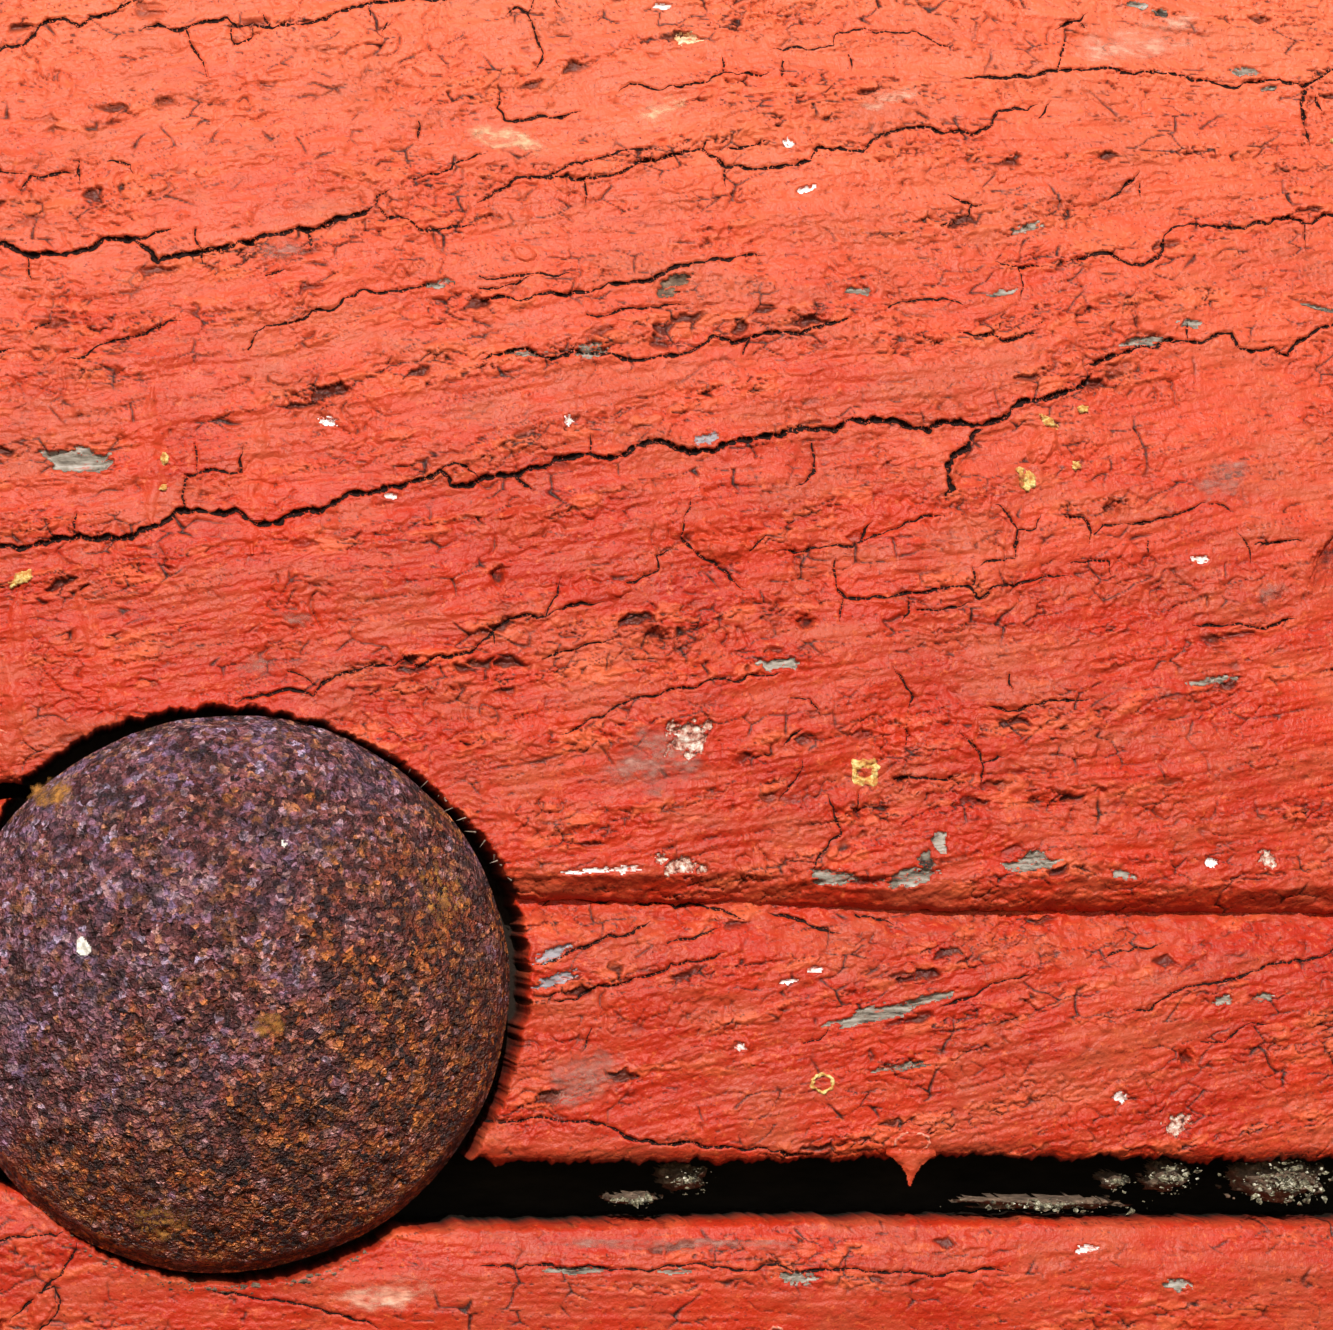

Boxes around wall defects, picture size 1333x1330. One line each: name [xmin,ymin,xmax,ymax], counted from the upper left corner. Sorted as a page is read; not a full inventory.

crack [0,0,445,79]
crack [0,12,1333,280]
crack [247,253,763,351]
crack [481,316,852,362]
peeling [38,446,113,473]
crack [0,320,1333,703]
peeling [664,718,713,760]
corrosion [33,784,70,806]
peeling [810,832,947,889]
corrosion [422,869,462,912]
peeling [821,991,954,1029]
corrosion [137,1210,188,1239]